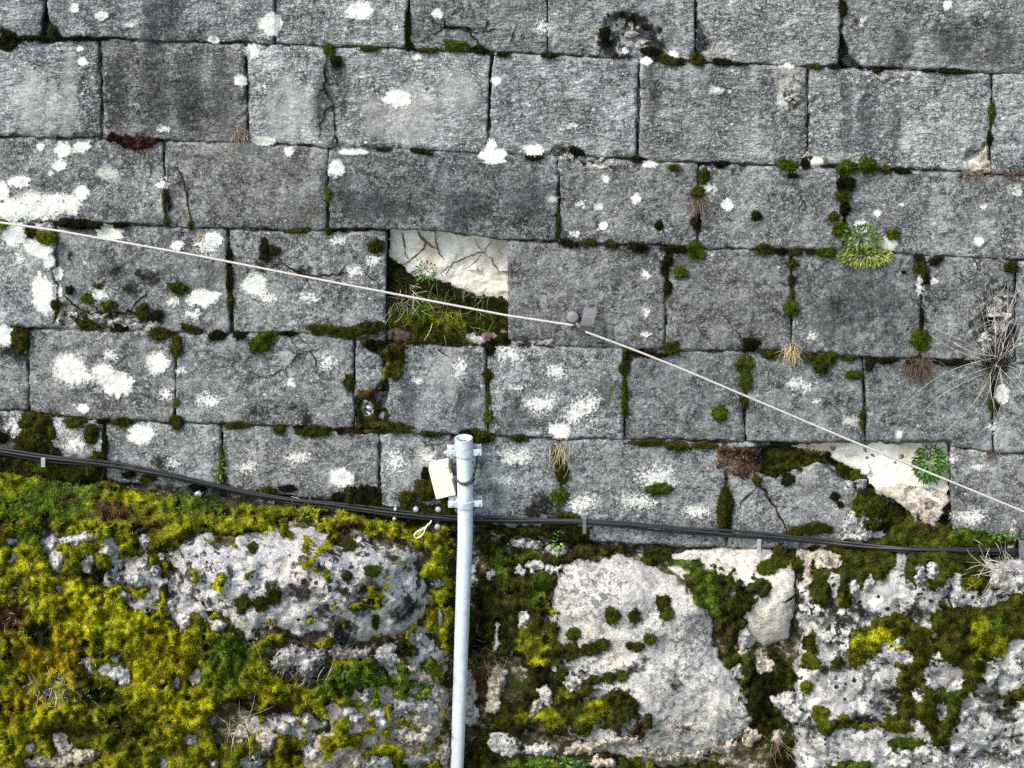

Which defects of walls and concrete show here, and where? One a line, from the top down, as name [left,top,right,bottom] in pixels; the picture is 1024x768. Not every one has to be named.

spalling [609,13,652,56]
crack [316,54,340,149]
spalling [389,229,508,302]
crack [402,231,508,278]
crack [738,471,788,531]
spalling [791,442,950,527]